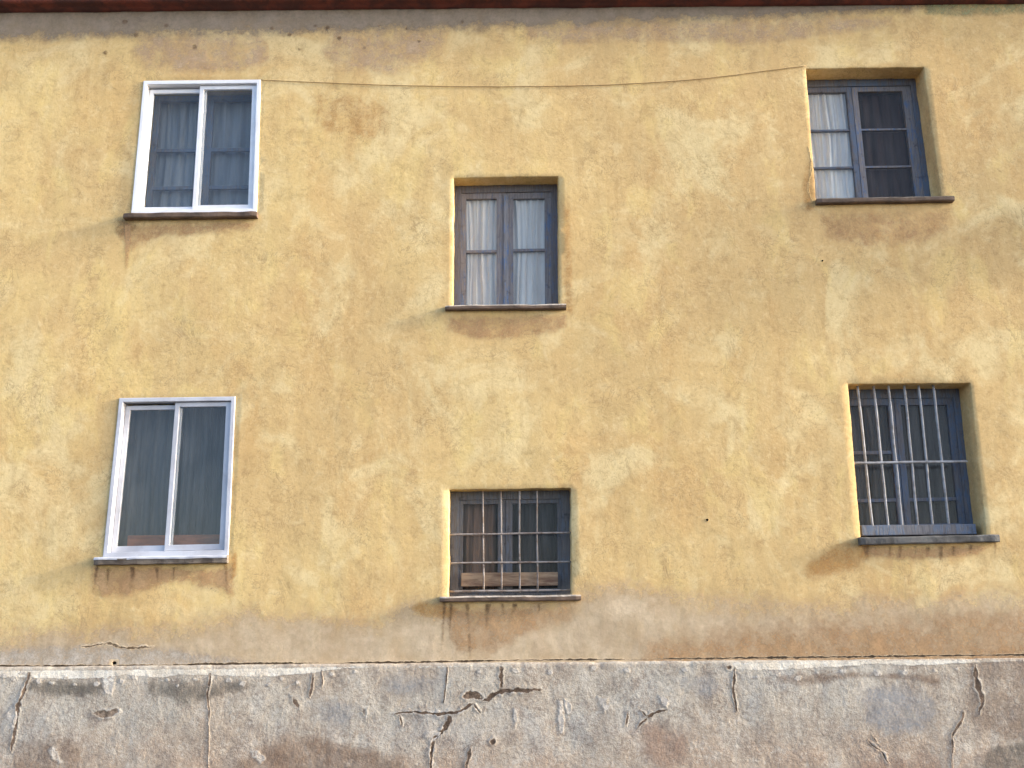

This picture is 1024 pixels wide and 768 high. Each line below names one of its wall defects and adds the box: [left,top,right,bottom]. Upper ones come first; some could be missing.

leakage [94,563,232,596]
crack [79,641,155,651]
leakage [0,587,1024,666]
crack [8,672,32,754]
crack [393,666,543,768]
crack [949,664,986,768]